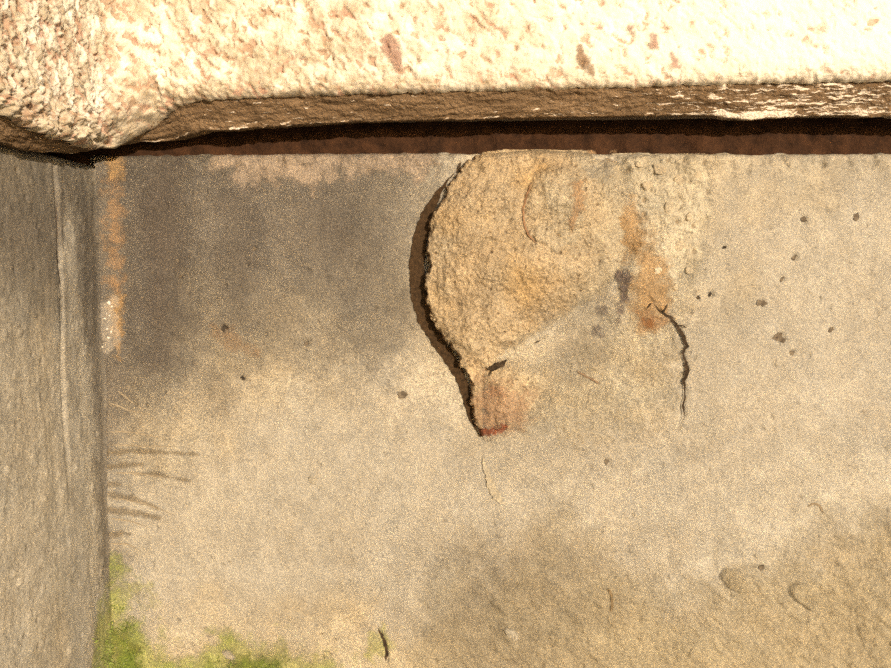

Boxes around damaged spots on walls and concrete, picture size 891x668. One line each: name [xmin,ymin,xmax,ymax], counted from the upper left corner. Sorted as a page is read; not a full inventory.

rust [107,156,124,179]
rust [108,296,124,349]
crack [647,303,690,422]
damp [0,153,891,668]
damp [492,582,891,668]